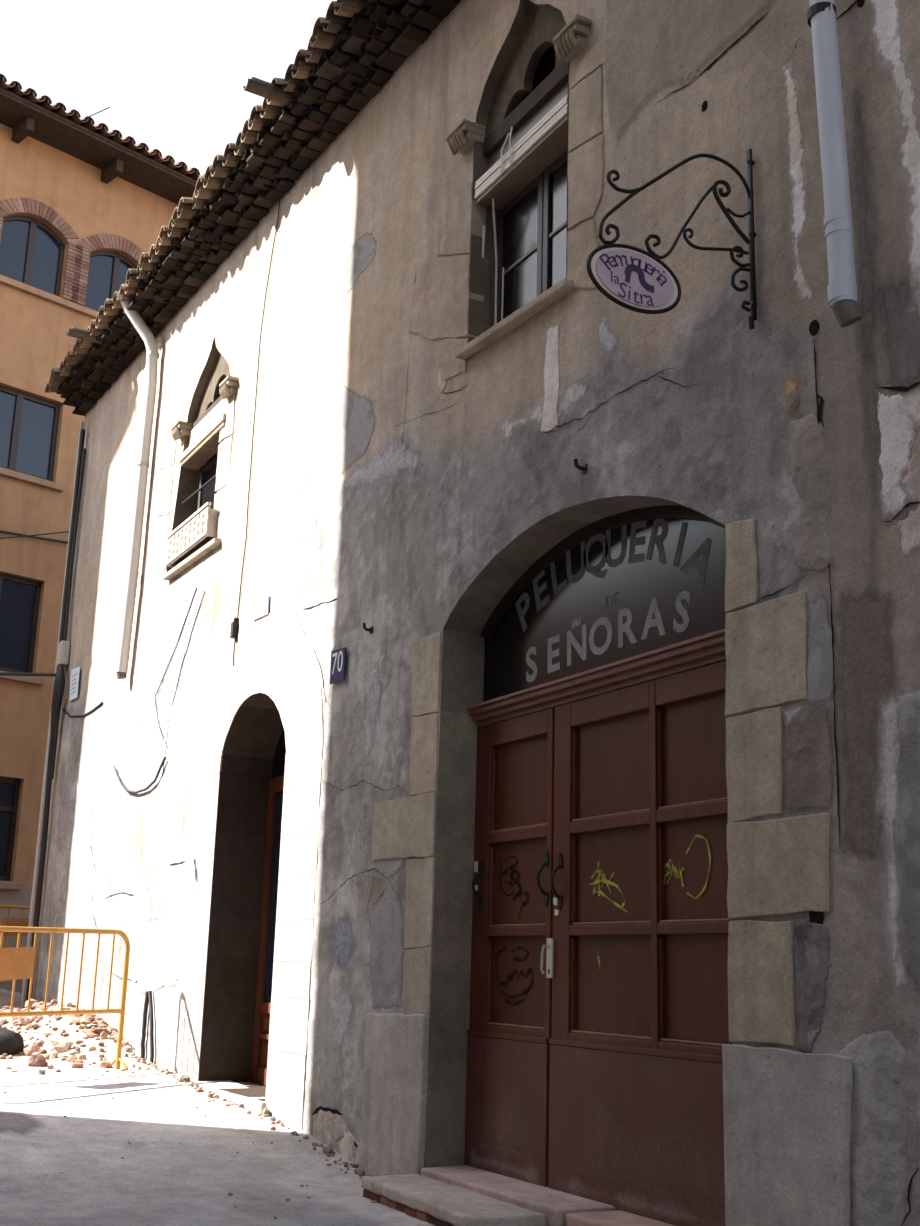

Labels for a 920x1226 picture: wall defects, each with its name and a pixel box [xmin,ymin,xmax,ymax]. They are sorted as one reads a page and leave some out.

crack [654,4,775,105]
water stain [784,66,812,300]
water stain [853,0,920,507]
crack [541,367,699,435]
peeling [877,381,920,557]
peeling [68,749,125,842]
water stain [784,530,906,986]